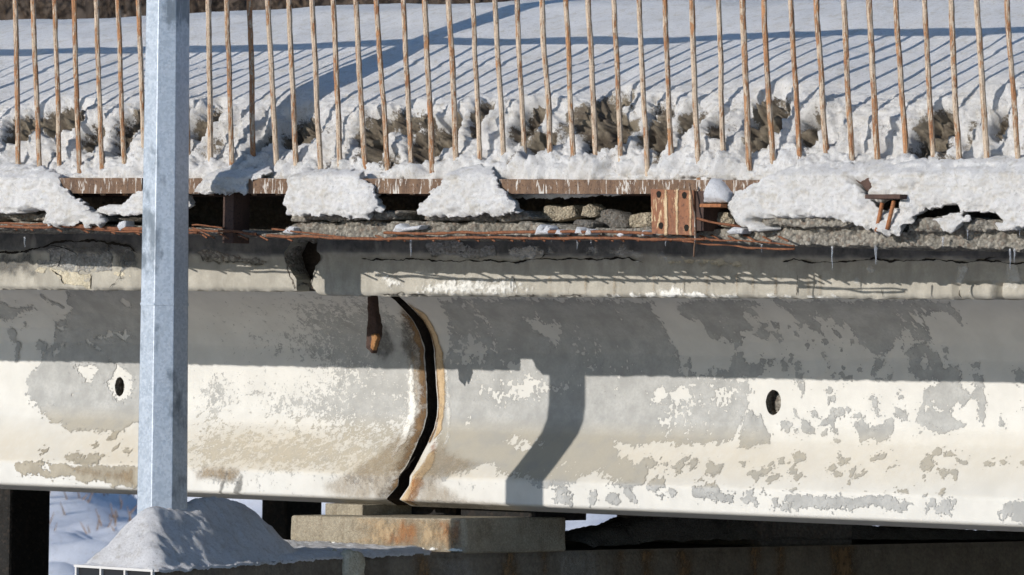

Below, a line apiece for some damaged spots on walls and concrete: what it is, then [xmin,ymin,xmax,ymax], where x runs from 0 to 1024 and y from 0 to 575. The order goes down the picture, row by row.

rust [664,189,691,235]
spalling [762,217,856,229]
spalling [909,216,1024,233]
peeling [0,246,141,490]
peeling [383,291,989,517]
peeling [998,365,1024,430]
peeling [983,456,1024,468]
peeling [997,496,1024,525]